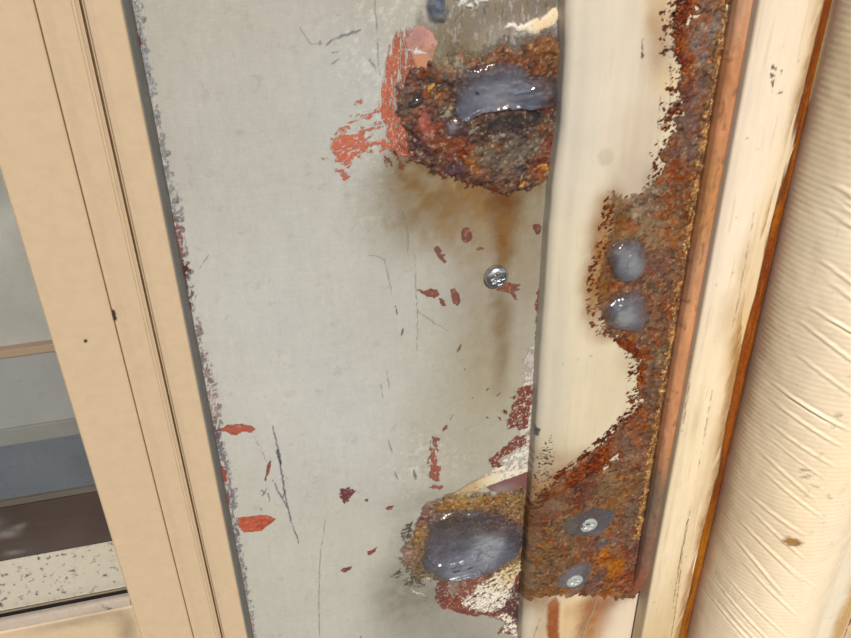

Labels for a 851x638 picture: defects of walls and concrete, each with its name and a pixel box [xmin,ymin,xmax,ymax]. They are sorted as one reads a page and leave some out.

peeling [457,0,488,11]
peeling [461,227,472,243]
peeling [418,289,460,306]
peeling [496,283,520,300]
peeling [132,0,275,637]
rust [388,0,730,638]
peeling [453,332,536,497]